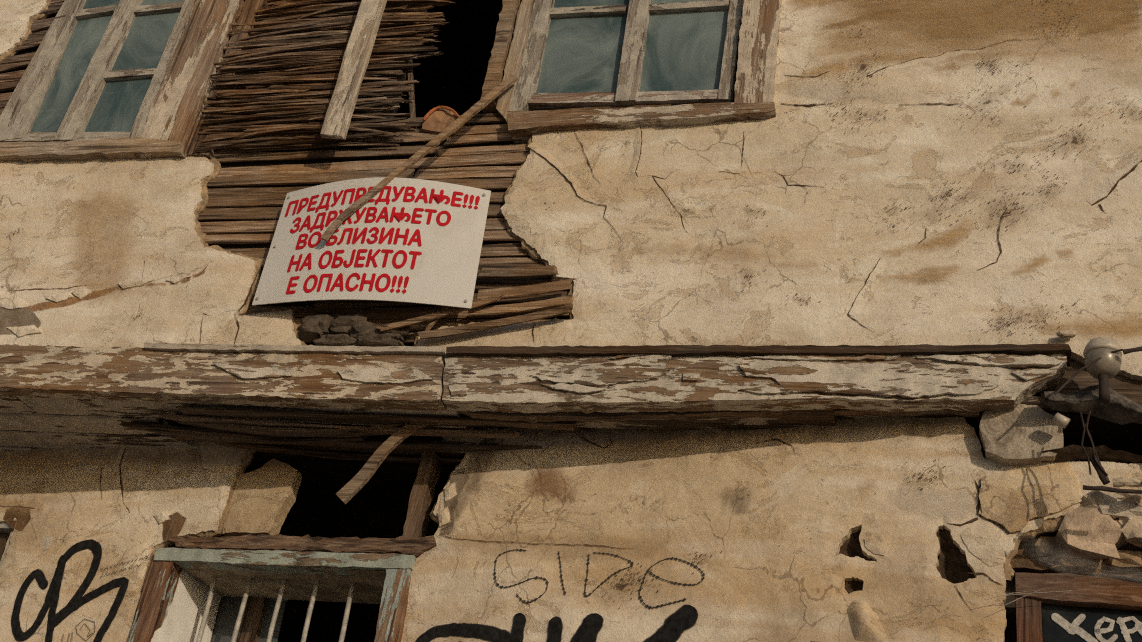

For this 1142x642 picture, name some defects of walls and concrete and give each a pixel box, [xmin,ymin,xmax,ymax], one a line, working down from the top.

crack [867,38,1039,83]
water stain [810,0,1141,136]
crack [781,100,834,108]
crack [526,130,621,245]
crack [1085,142,1142,214]
crack [981,207,1012,269]
peeling [0,267,205,337]
peeling [337,368,433,384]
peeling [533,354,672,394]
peeling [738,353,1062,398]
spalling [839,529,873,561]
peeling [936,462,1082,584]